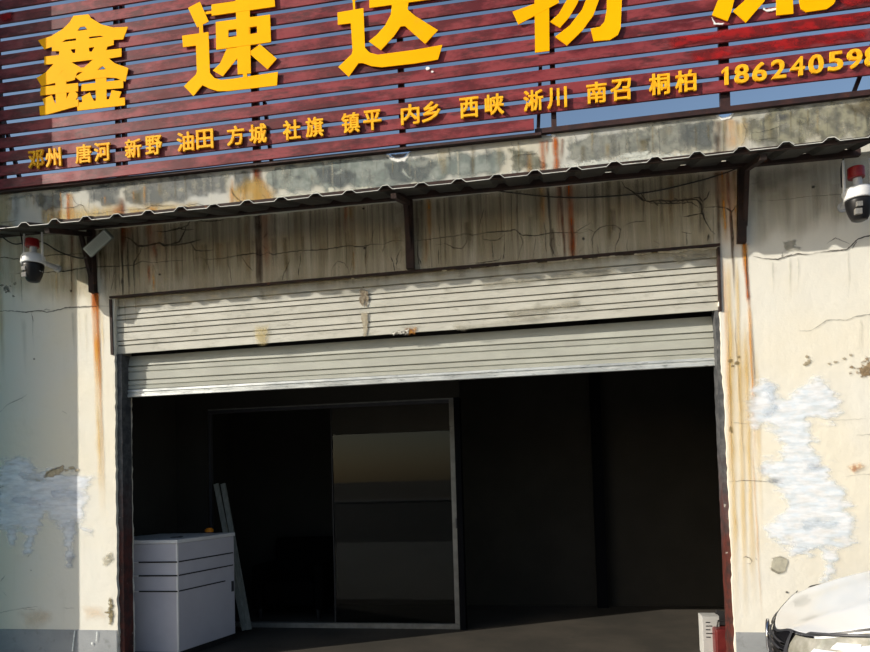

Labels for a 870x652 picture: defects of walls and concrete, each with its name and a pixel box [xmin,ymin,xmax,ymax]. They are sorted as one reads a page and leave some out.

crack [0,203,268,319]
water stain [15,149,546,212]
crack [282,181,737,280]
corrosion [547,185,574,256]
corrosion [717,172,749,299]
crack [754,235,870,260]
corrosion [92,293,100,379]
peeling [0,458,92,565]
peeling [747,377,853,582]